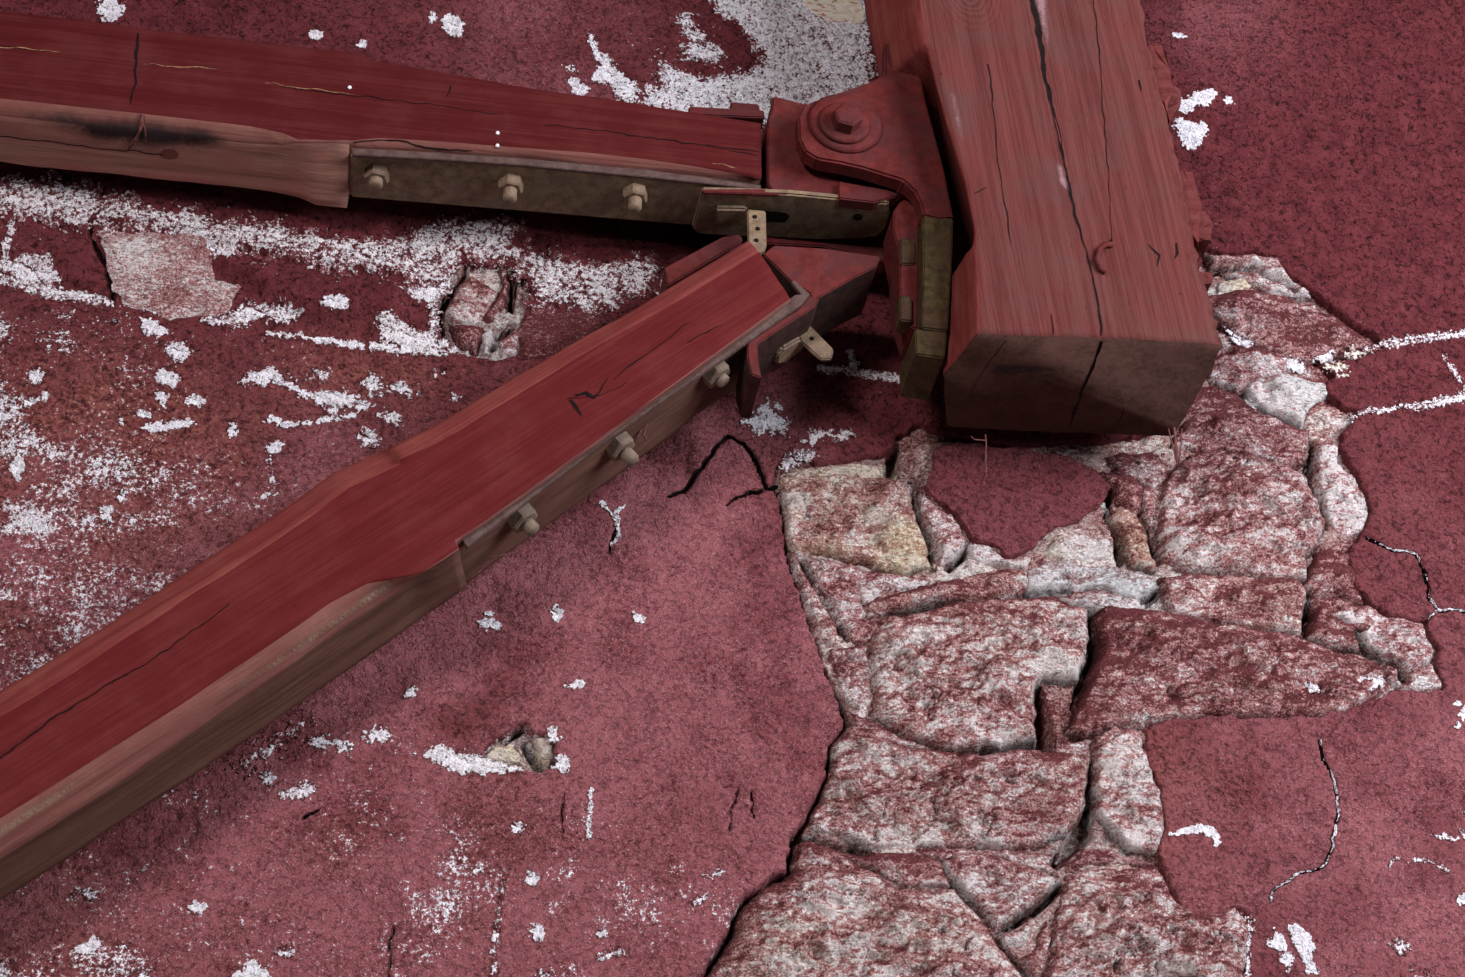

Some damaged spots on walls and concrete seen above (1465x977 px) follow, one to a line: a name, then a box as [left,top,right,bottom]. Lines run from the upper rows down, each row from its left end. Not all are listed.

peeling [0,168,666,500]
crack [667,434,779,506]
crack [1365,536,1465,624]
peeling [476,611,502,632]
peeling [549,604,565,623]
peeling [632,611,646,624]
flaking render [705,252,1465,977]
peeling [403,684,418,698]
peeling [563,679,586,689]
peeling [413,726,570,777]
crack [1269,738,1340,903]
peeling [595,926,625,961]